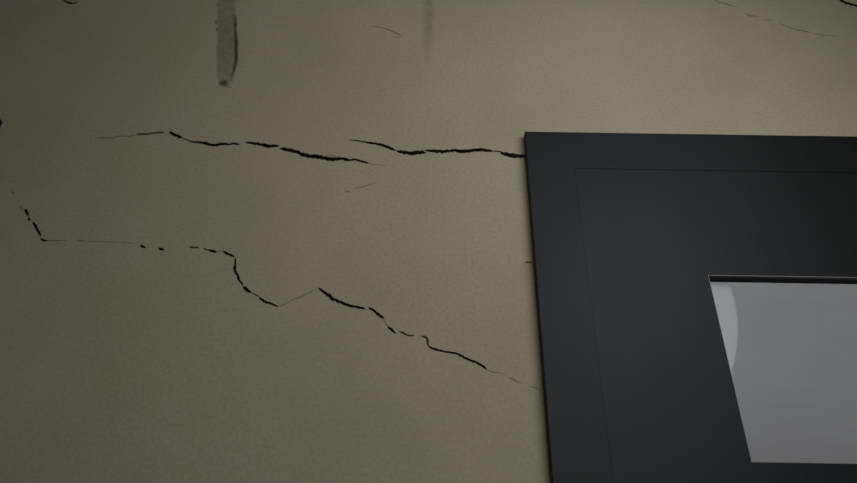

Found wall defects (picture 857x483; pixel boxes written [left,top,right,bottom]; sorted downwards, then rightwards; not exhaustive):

crack [716,0,835,36]
crack [96,131,525,192]
crack [12,190,164,250]
crack [189,246,540,389]